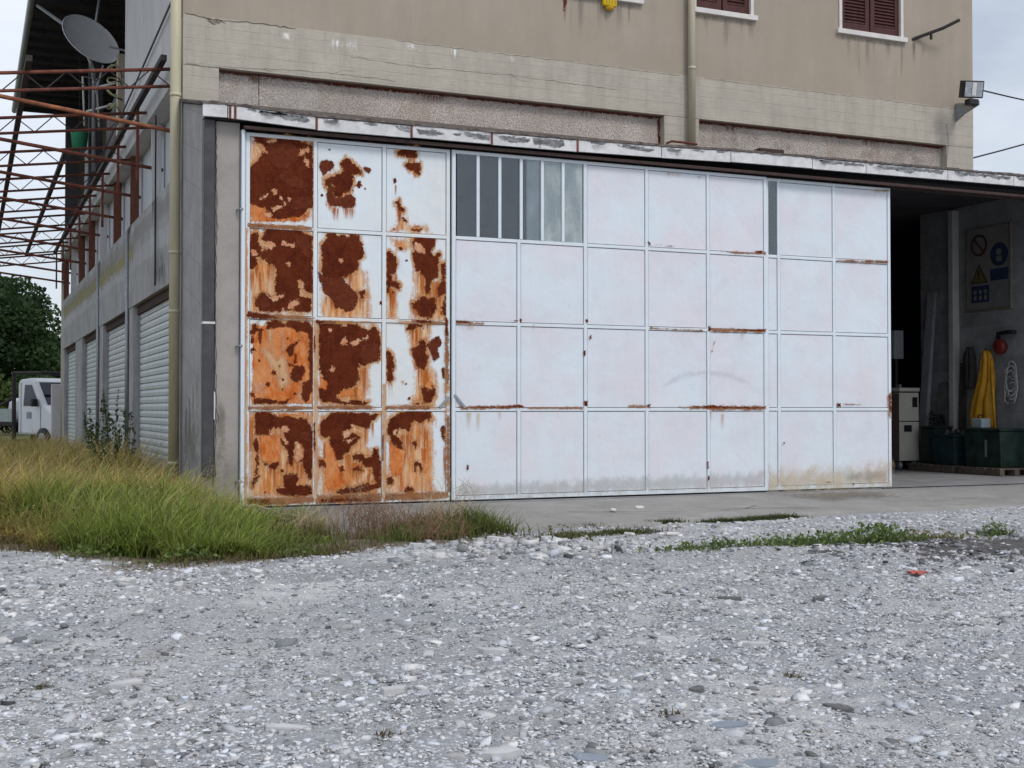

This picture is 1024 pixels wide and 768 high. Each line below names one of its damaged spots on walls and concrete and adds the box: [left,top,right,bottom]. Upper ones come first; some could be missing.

rust [244,133,588,506]
rust [650,327,766,352]